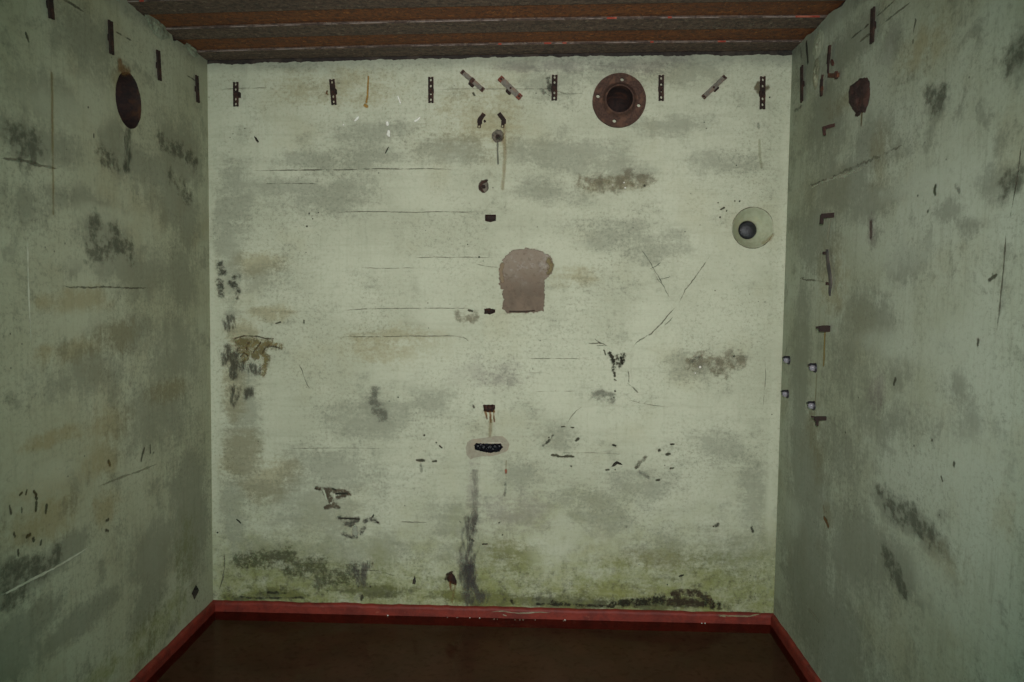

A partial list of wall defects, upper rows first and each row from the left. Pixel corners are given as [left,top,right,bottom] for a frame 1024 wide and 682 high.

flaking render [498,247,554,314]
mould [233,550,373,601]
water stain [459,517,487,604]
mould [536,589,722,610]